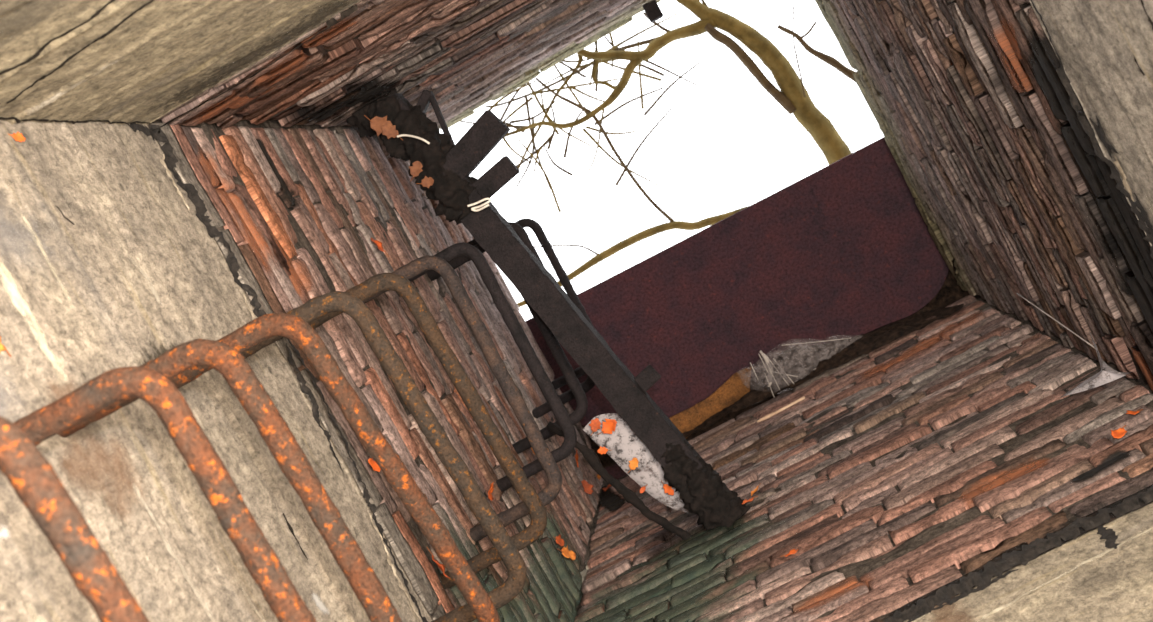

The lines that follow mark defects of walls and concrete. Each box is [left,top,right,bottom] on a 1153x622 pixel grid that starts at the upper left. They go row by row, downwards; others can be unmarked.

crack [0,0,363,320]
crack [1031,0,1153,259]
crack [281,337,428,622]
crack [885,485,1153,622]